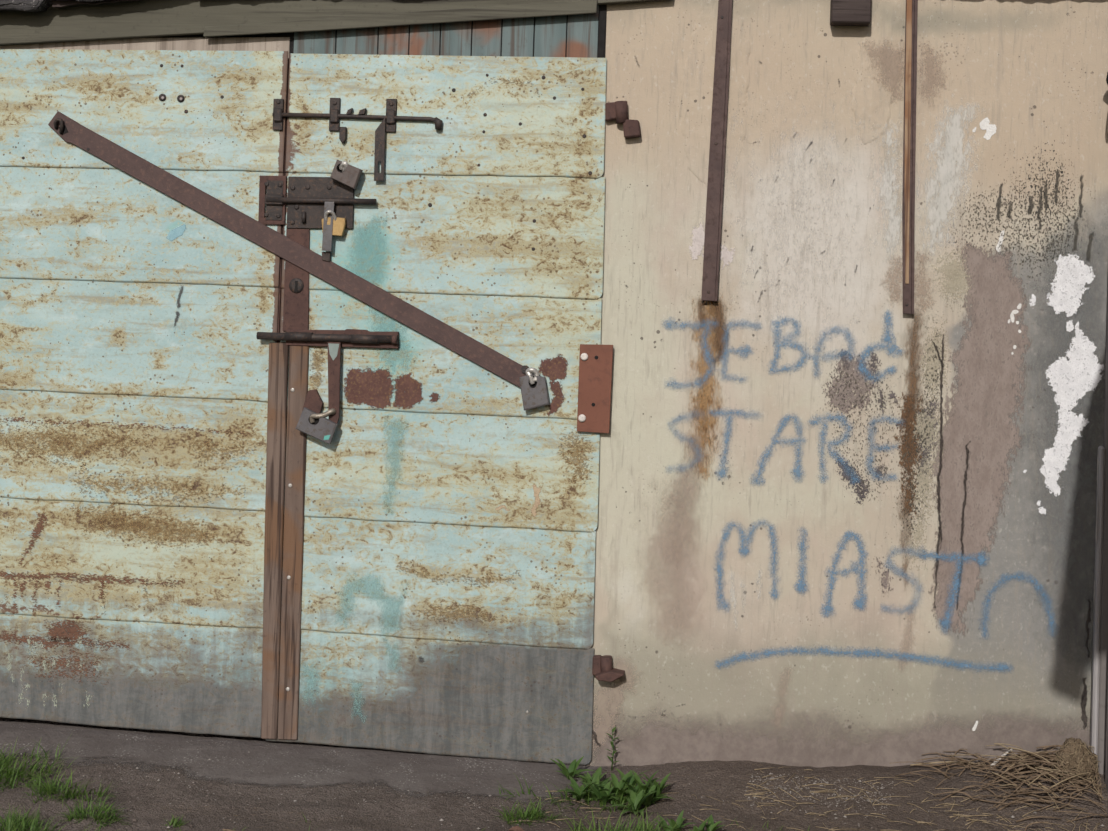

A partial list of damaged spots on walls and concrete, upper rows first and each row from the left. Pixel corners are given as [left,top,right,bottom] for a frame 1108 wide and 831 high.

flaking render [972,117,997,140]
corrosion [0,417,252,437]
corrosion [344,368,440,410]
corrosion [538,354,568,416]
corrosion [689,299,728,476]
corrosion [894,315,923,546]
crack [931,335,971,609]
damp [820,107,1101,648]
peeling [1008,254,1104,515]
corrosion [0,513,183,685]